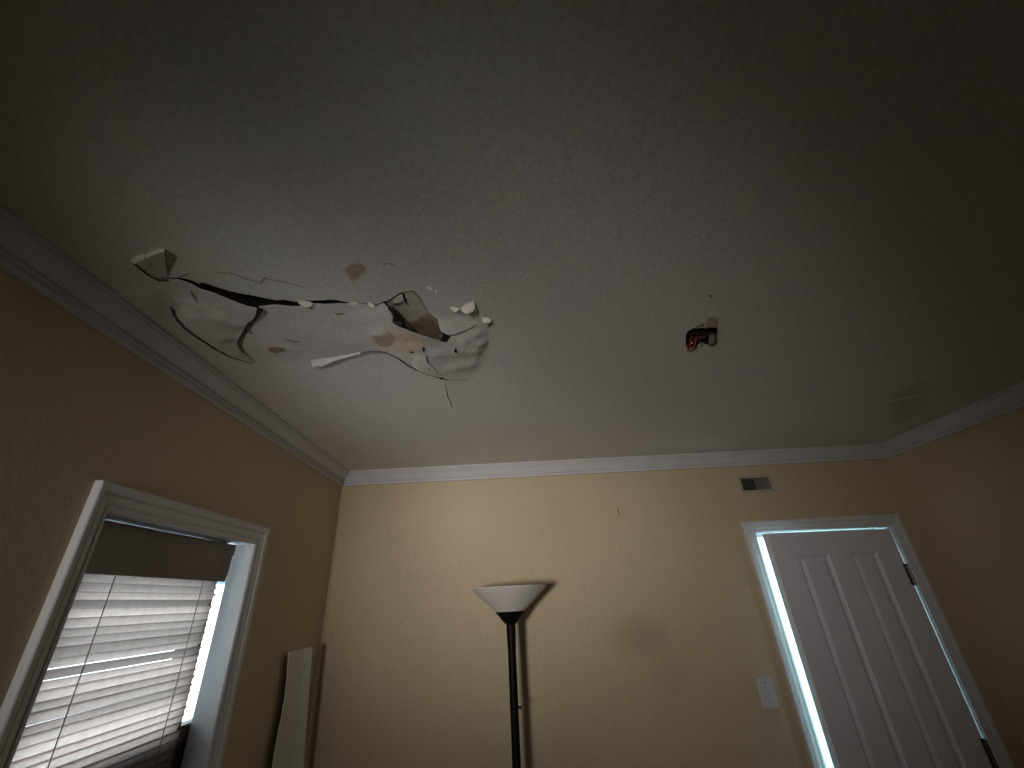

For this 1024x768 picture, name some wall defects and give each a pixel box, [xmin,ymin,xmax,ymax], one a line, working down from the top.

crack [134,264,385,354]
flaking render [334,287,451,342]
peeling [450,301,491,323]
leakage [368,327,425,354]
hole [686,323,718,349]
peeling [311,351,372,367]